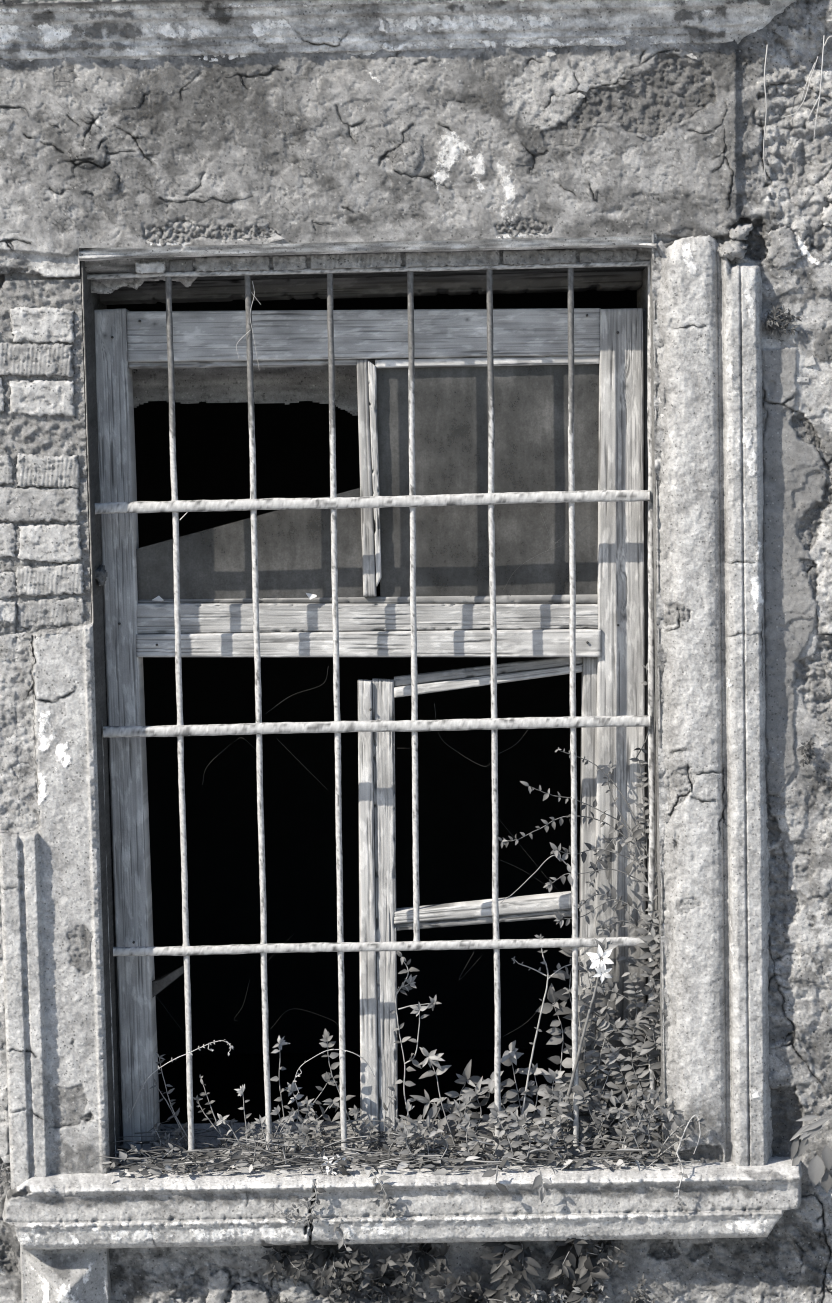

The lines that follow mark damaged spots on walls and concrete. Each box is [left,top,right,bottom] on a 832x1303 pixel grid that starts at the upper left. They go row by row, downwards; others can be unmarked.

peeling [229,0,381,37]
spalling [379,0,715,138]
crack [0,93,152,194]
flaking render [0,267,92,833]
spalling [799,472,832,598]
crack [28,636,74,702]
spalling [792,635,832,726]
crack [769,949,823,1086]
spalling [0,1154,30,1199]
spalling [433,1182,465,1190]
peeling [0,1216,428,1303]
crack [790,1194,832,1297]